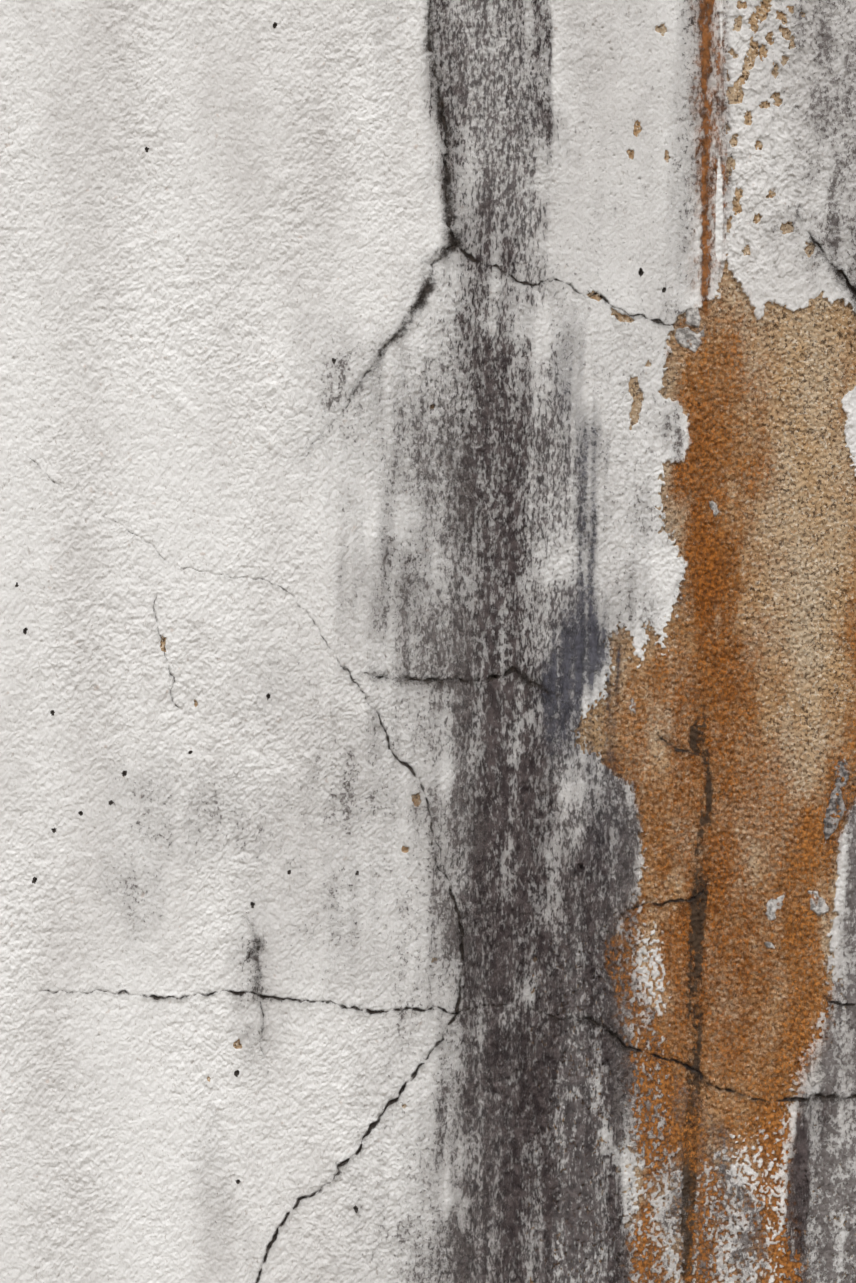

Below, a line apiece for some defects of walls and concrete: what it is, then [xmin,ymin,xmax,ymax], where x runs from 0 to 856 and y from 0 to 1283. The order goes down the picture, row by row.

crack [346,0,674,408]
peeling [726,0,805,234]
peeling [804,242,816,258]
leakage [773,0,856,286]
crack [797,212,856,300]
leakage [112,777,304,862]
crack [43,578,856,1283]
leakage [299,0,768,1283]
peeling [526,245,856,1283]
corrosion [605,0,856,1283]